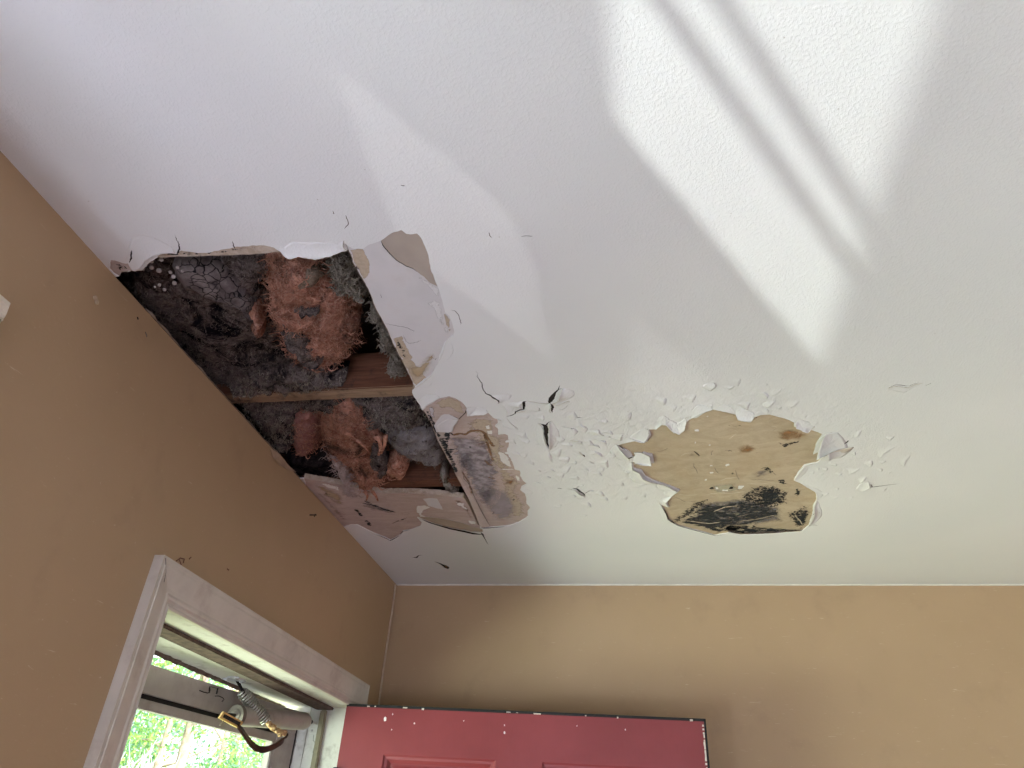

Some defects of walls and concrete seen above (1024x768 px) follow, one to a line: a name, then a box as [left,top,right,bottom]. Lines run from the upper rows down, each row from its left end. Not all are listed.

peeling [110,260,131,275]
peeling [271,230,532,544]
crack [477,375,585,457]
peeling [610,405,854,536]